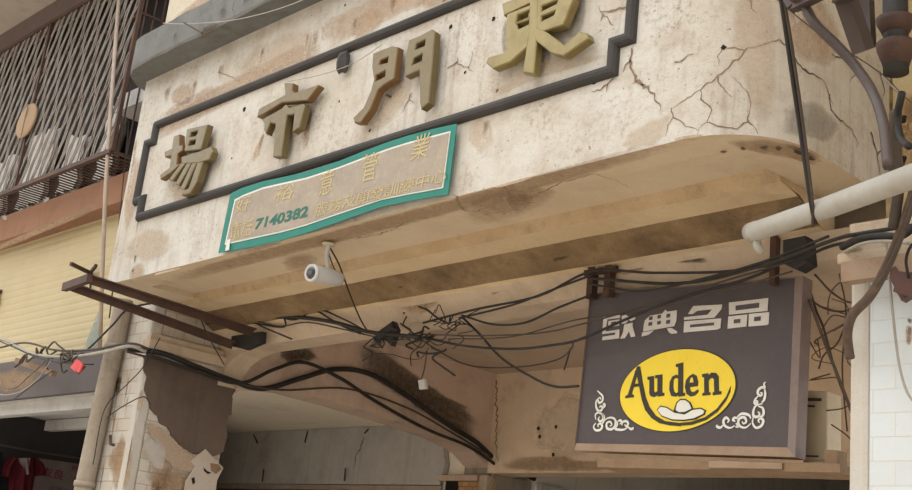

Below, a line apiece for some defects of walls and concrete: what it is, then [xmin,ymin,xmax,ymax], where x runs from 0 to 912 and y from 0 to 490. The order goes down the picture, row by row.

crack [592,39,881,173]
damp [741,142,816,163]
damp [281,349,314,361]
damp [368,341,468,430]
peeling [145,423,197,473]
spalling [445,474,479,490]